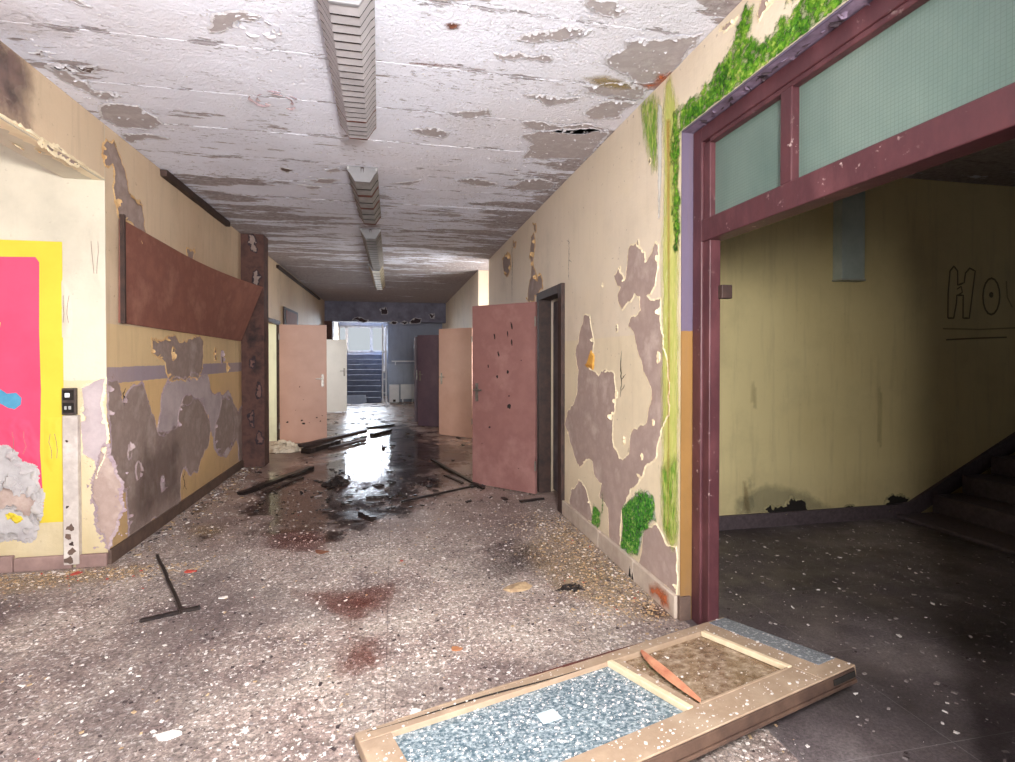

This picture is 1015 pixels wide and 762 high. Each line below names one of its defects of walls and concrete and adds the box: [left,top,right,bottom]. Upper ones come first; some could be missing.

peeling [199,10,262,41]
peeling [493,0,629,63]
peeling [0,44,179,244]
peeling [404,123,457,139]
peeling [456,108,492,122]
peeling [517,29,704,162]
peeling [453,176,559,193]
peeling [526,223,543,302]
peeling [565,238,670,548]
peeling [80,334,265,550]
peeling [0,445,45,544]
peeling [631,524,679,595]